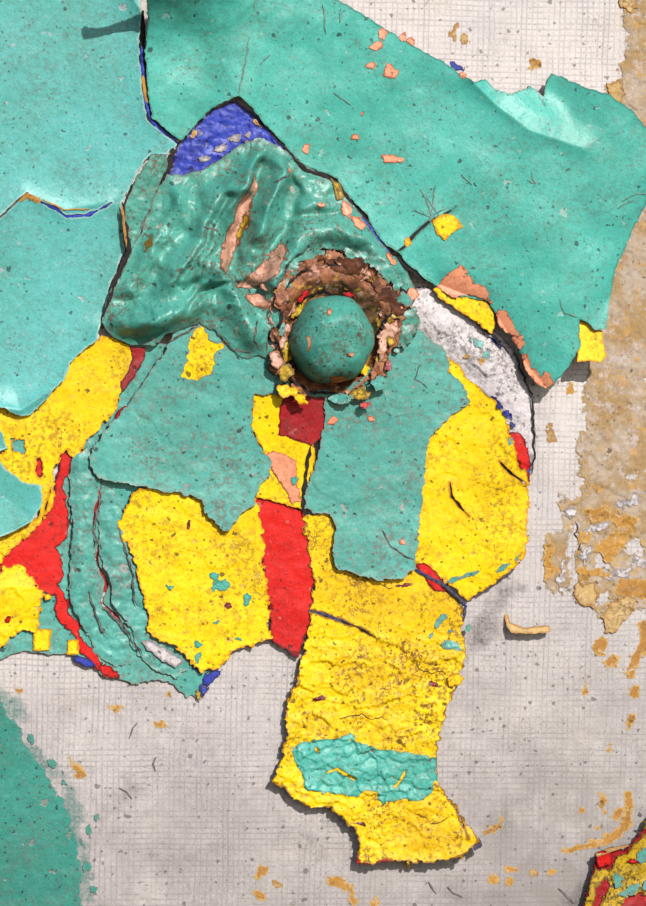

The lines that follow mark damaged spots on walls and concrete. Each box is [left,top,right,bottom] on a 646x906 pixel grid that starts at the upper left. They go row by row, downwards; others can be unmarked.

peeling [619,0,638,13]
crack [139,10,178,143]
peeling [606,80,625,102]
peeling [169,100,284,175]
crack [0,193,132,315]
peeling [432,214,463,241]
rust [260,247,420,409]
peeling [0,286,536,701]
peeling [542,493,646,633]
crack [308,610,375,637]
peeling [504,614,550,634]
peeling [581,819,646,906]